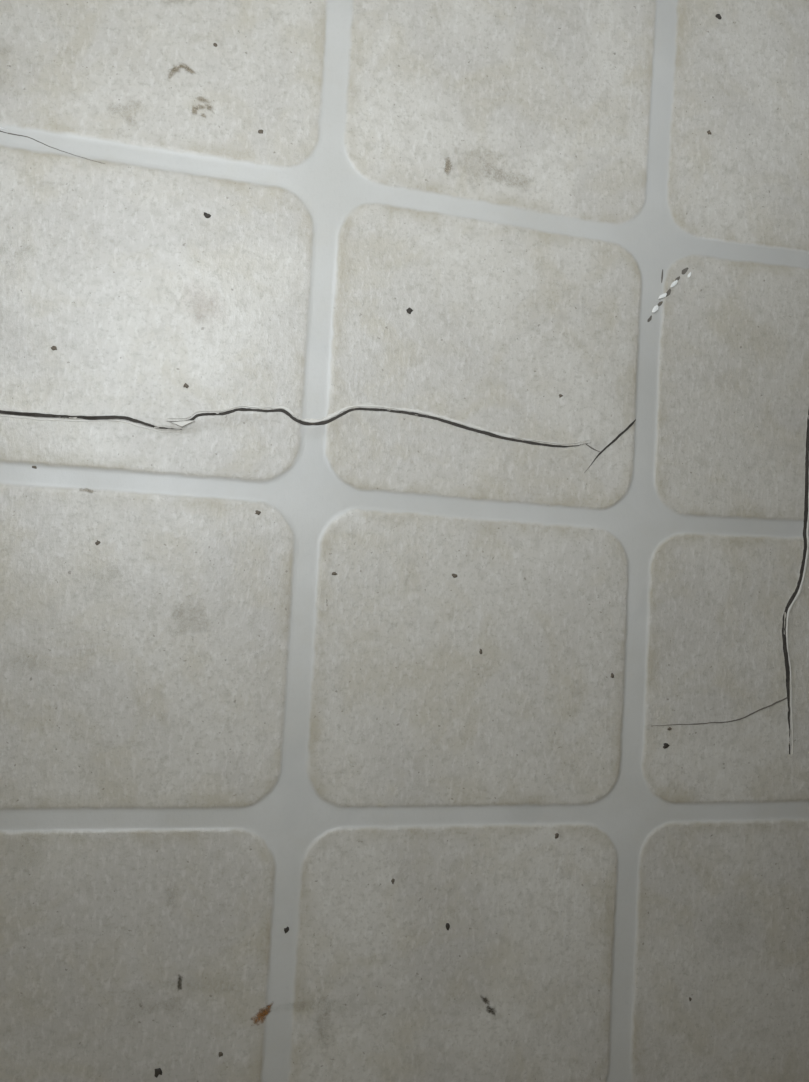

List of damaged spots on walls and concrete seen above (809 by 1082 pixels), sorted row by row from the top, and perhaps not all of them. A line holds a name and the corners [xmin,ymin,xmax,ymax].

crack [0,404,636,472]
crack [655,410,809,754]